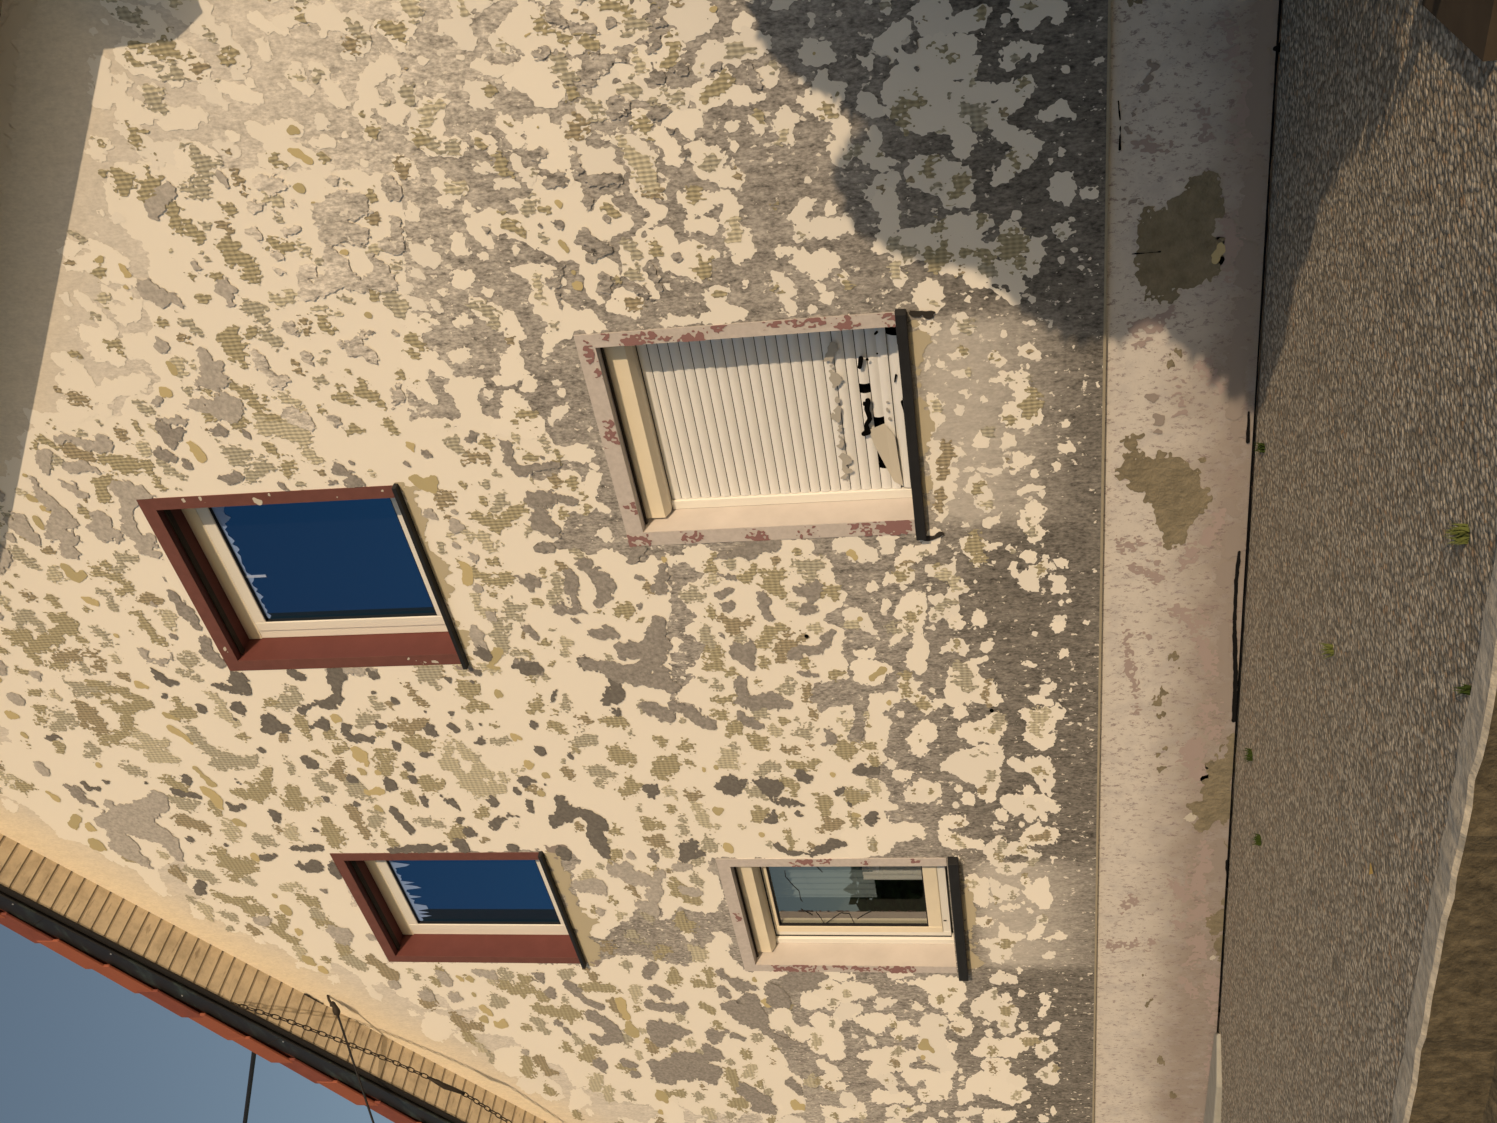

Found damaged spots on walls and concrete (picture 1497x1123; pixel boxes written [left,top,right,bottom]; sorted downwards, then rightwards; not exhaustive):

spalling [1133,170,1226,305]
spalling [1114,433,1213,550]
peeling [0,0,1099,1123]